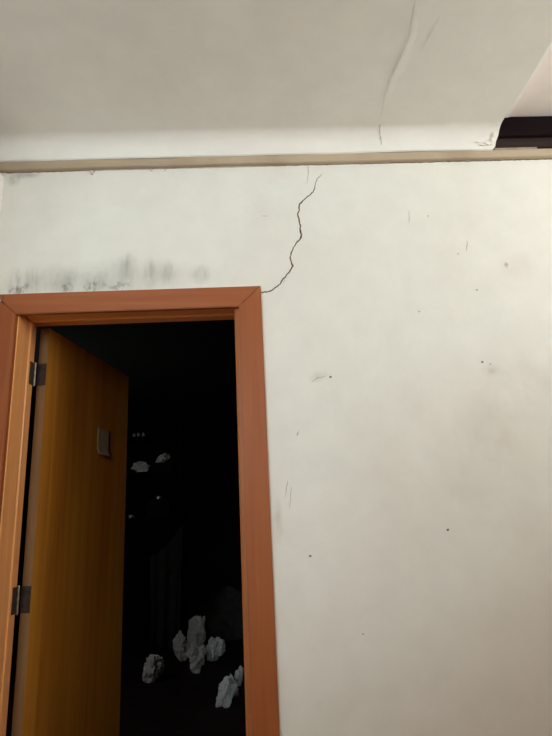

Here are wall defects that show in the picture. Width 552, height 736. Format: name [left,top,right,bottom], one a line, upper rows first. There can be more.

crack [366,157,552,165]
crack [261,164,343,293]